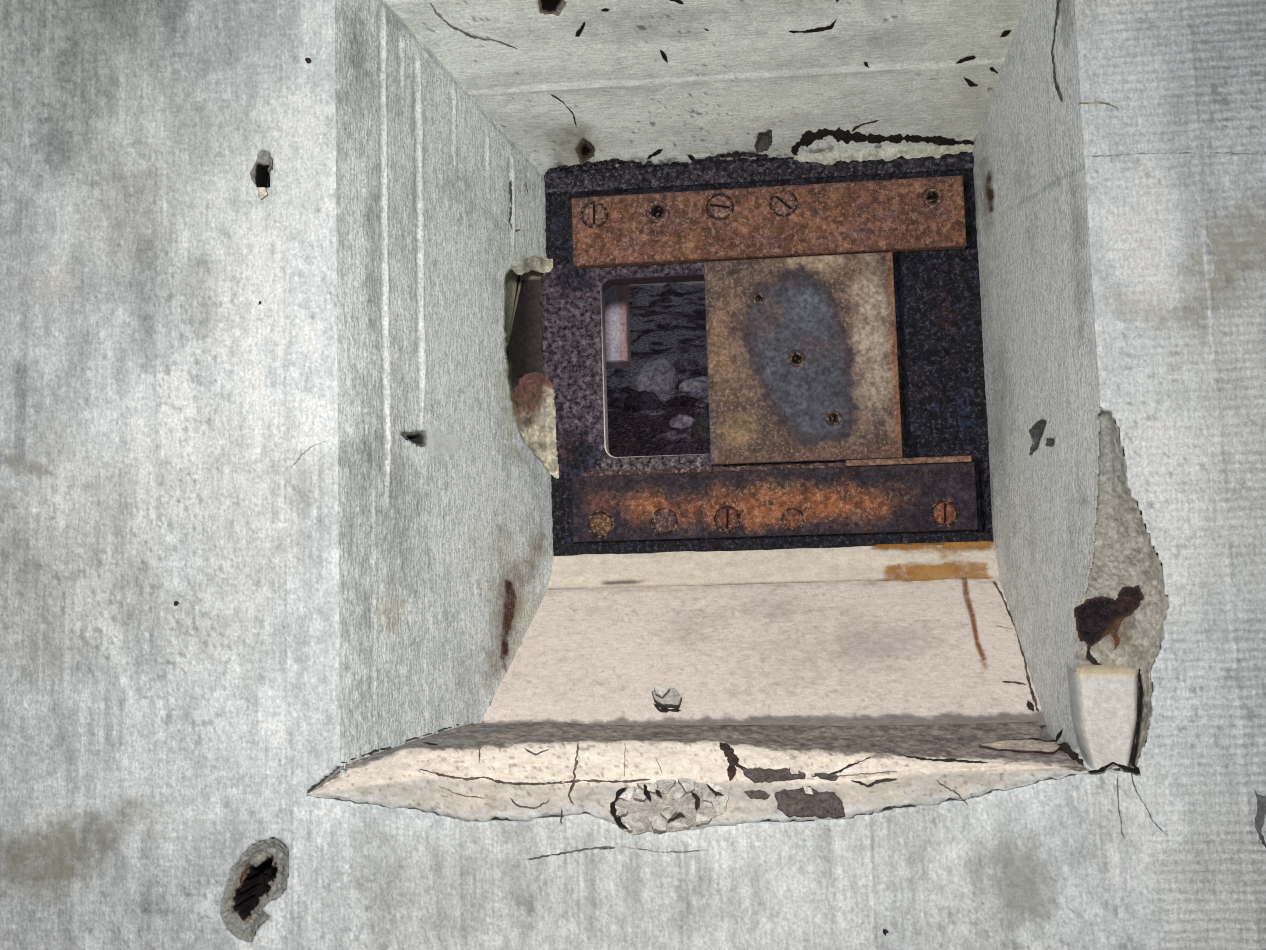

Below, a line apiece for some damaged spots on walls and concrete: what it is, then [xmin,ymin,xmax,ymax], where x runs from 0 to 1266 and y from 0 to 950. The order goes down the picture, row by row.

spalling [503,255,559,479]
rust [873,541,993,668]
spalling [979,407,1169,774]
spalling [610,778,729,835]
spalling [743,767,845,819]
crack [1254,789,1266,848]
spalling [220,839,289,942]